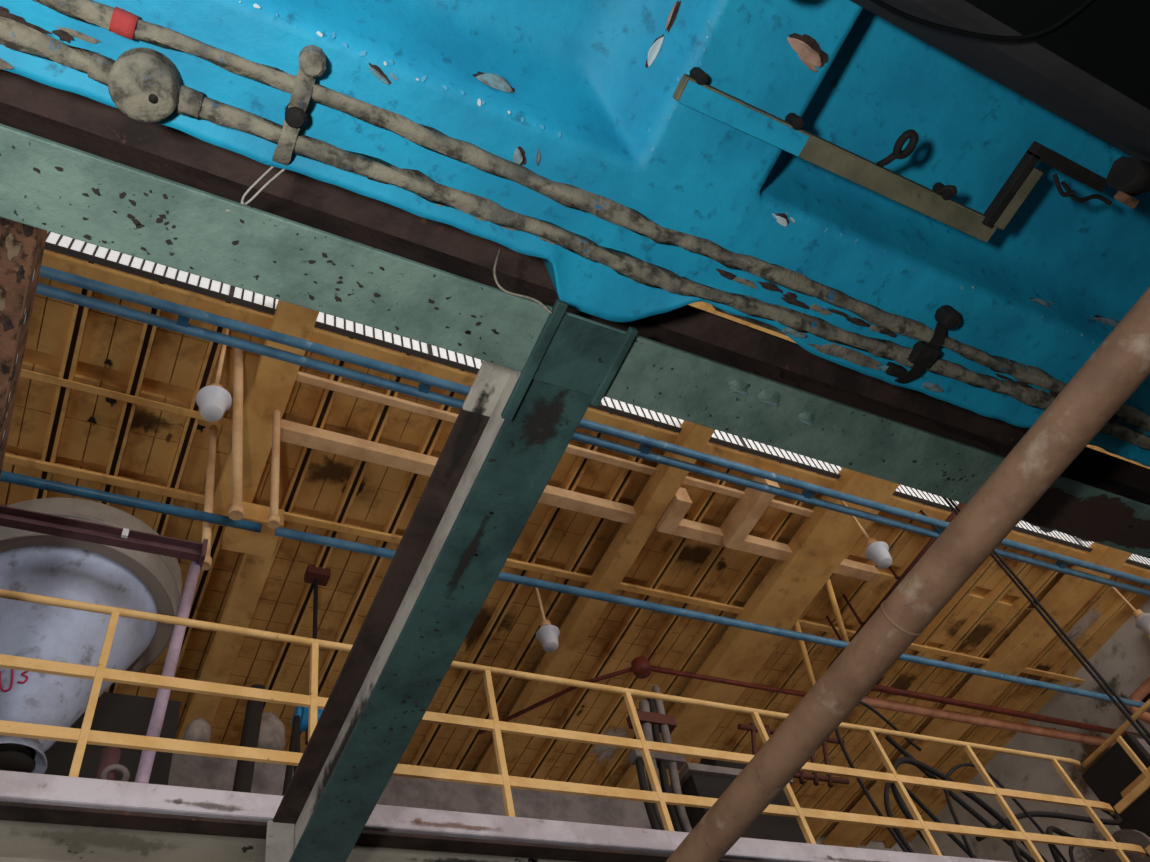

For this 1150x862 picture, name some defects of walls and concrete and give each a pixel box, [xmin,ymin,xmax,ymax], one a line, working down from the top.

peeling [316,31,398,86]
peeling [473,71,515,93]
peeling [645,0,681,68]
peeling [787,33,829,72]
corrosion [6,223,34,283]